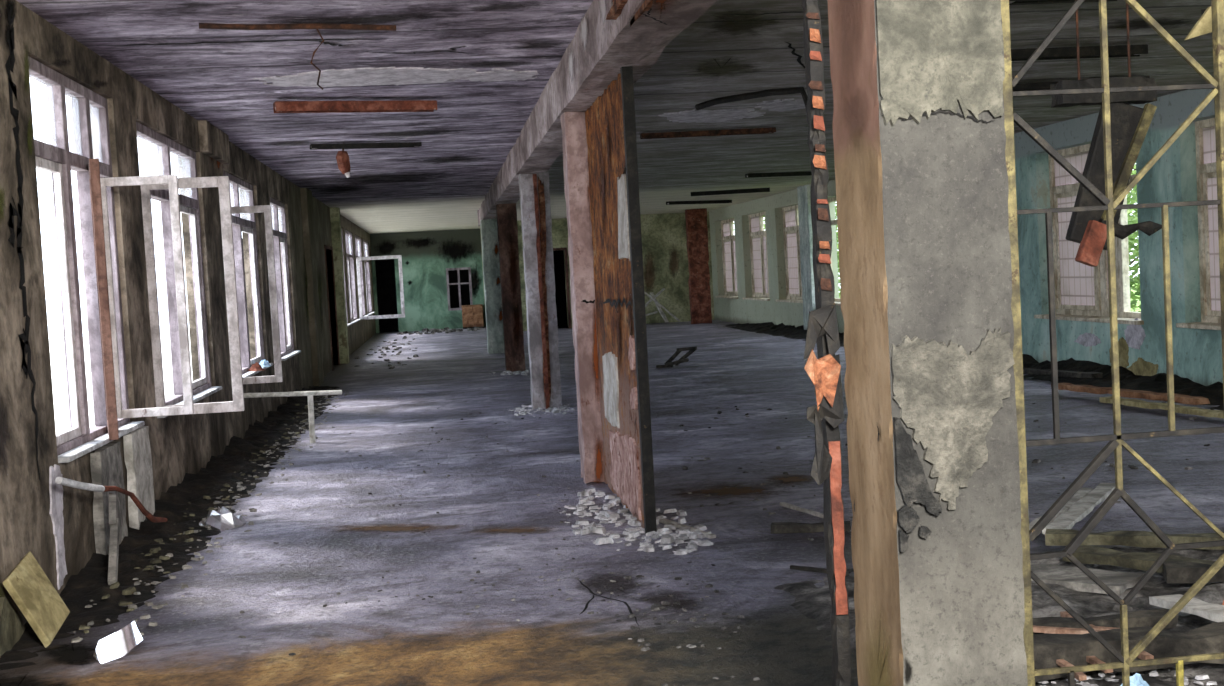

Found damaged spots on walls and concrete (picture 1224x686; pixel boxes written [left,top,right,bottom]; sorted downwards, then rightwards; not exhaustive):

crack [5,4,40,480]
peeling [617,167,630,261]
peeling [602,335,642,520]
spalling [891,328,1015,553]